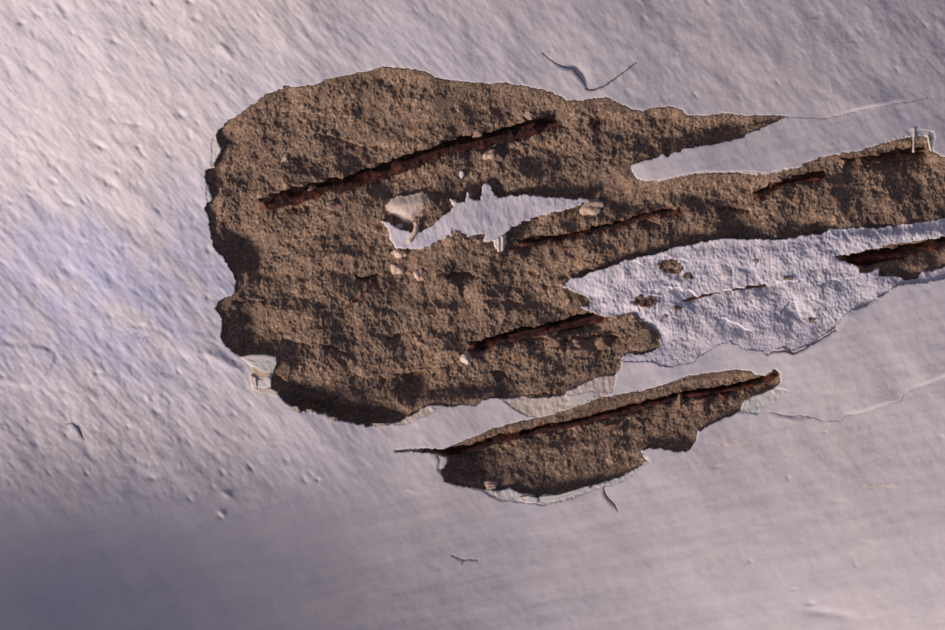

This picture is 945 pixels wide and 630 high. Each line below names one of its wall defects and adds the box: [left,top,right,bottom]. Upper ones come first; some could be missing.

spalling [205,66,945,505]
crack [543,54,637,90]